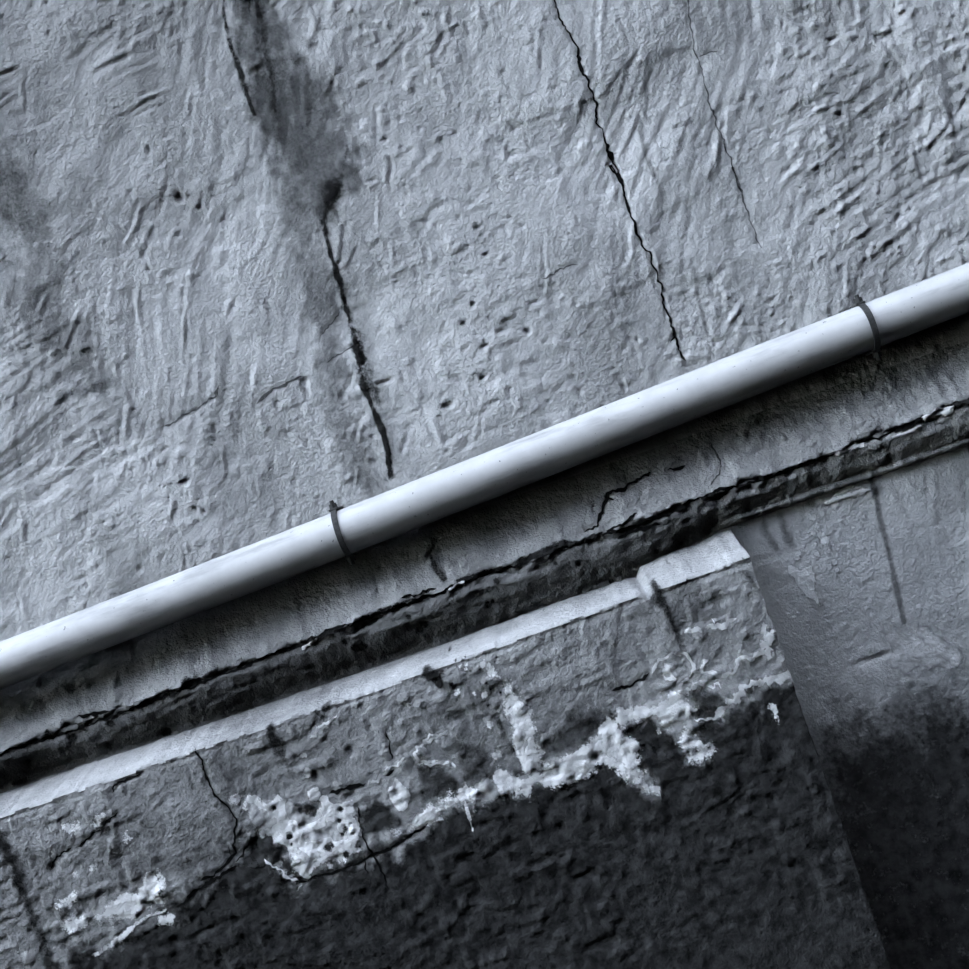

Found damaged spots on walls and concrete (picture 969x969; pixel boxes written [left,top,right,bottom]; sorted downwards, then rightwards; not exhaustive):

water stain [222,0,393,479]
crack [554,0,686,361]
crack [687,0,762,248]
spalling [277,630,333,654]
crack [0,399,969,757]
spalling [516,532,603,567]
water stain [650,580,681,645]
spalling [756,459,816,481]
water stain [884,622,962,673]
spalling [886,397,969,439]
crack [176,730,456,907]
water stain [0,659,969,969]